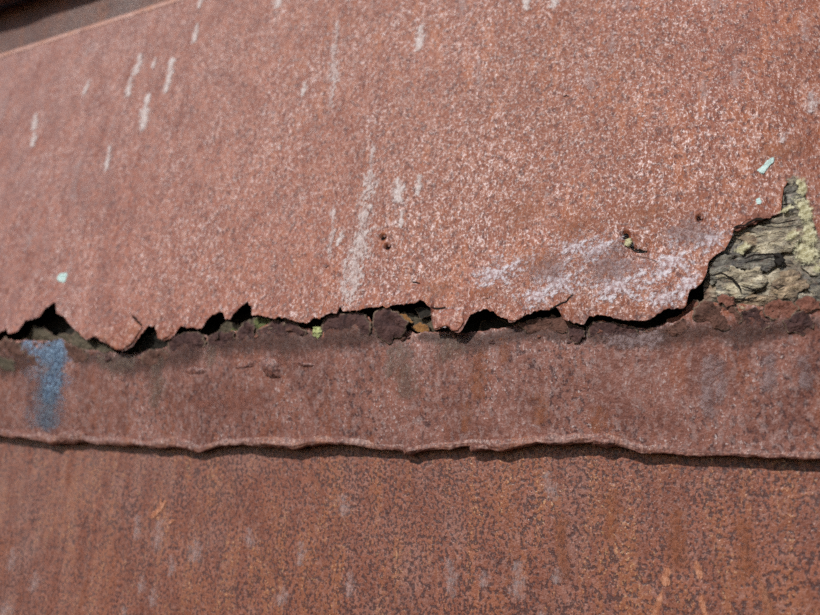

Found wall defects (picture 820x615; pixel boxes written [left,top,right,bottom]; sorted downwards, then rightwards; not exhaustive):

efflorescence [472,229,724,308]
spalling [703,176,820,310]